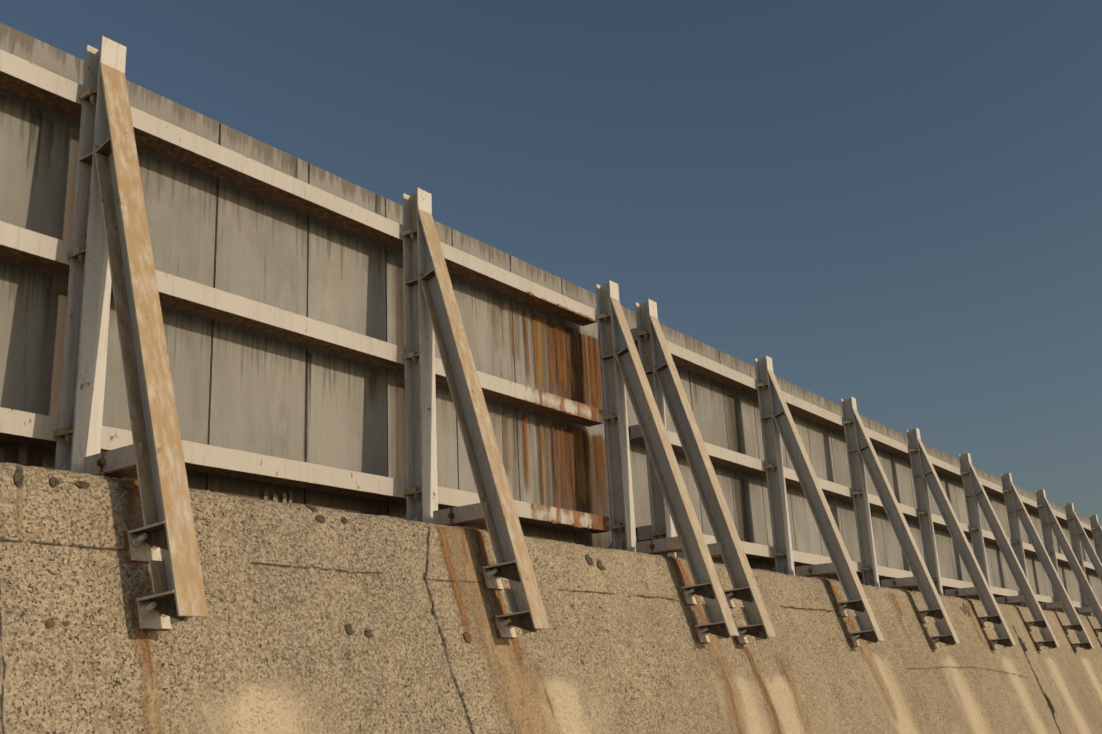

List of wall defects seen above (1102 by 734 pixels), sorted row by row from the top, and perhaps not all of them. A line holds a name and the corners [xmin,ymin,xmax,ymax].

rust [504,291,613,541]
rust [436,526,551,734]
rust [670,556,745,734]